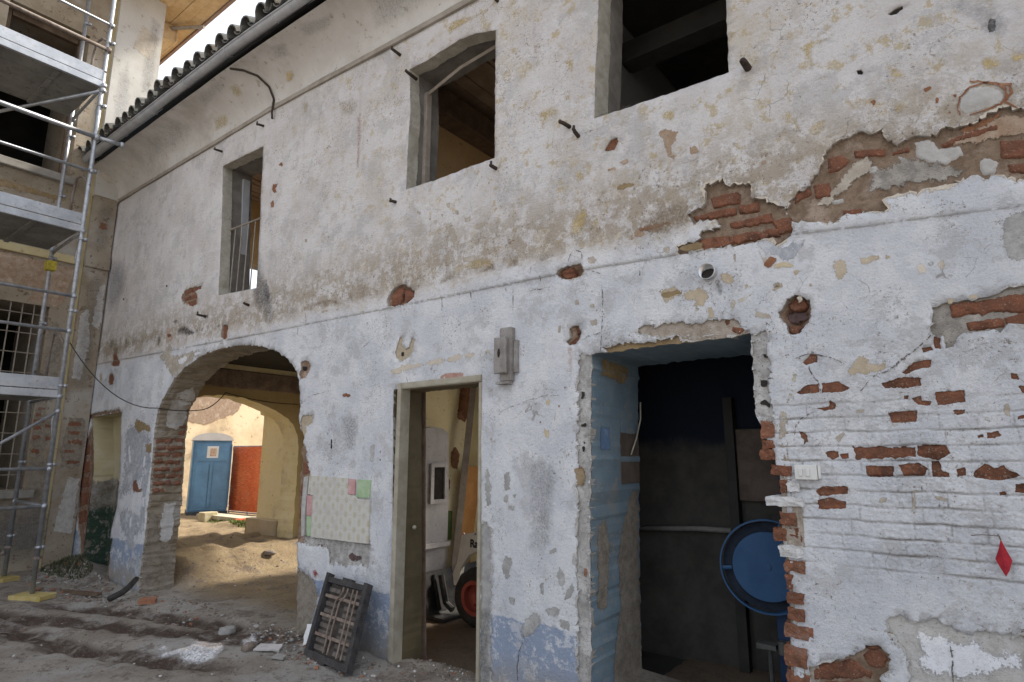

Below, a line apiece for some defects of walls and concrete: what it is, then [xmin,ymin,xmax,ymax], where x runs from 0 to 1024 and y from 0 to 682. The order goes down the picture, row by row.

flaking render [72,284,106,381]
flaking render [387,275,415,307]
flaking render [521,100,1024,682]
flaking render [53,407,123,557]
peeling [120,387,241,593]